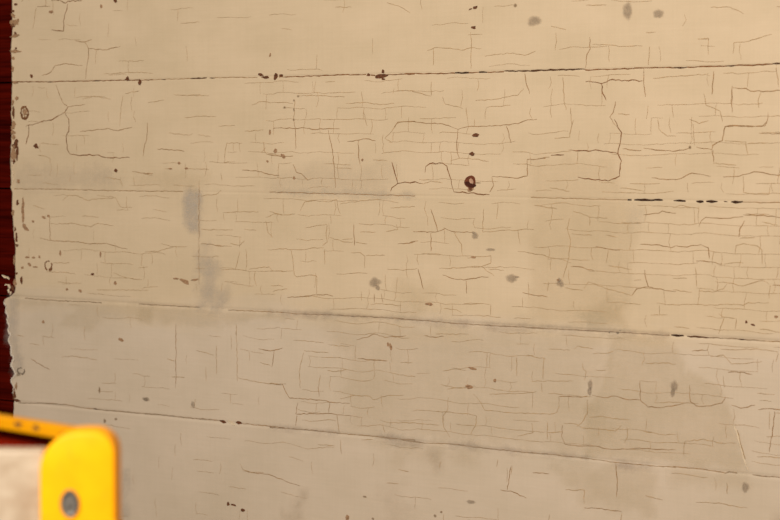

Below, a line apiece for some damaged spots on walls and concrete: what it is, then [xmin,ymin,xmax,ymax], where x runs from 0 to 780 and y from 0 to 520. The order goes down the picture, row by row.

crack [26,0,780,332]
peeling [2,227,23,402]
crack [236,326,403,454]
crack [366,346,780,458]
crack [694,329,778,375]
crack [566,472,622,517]